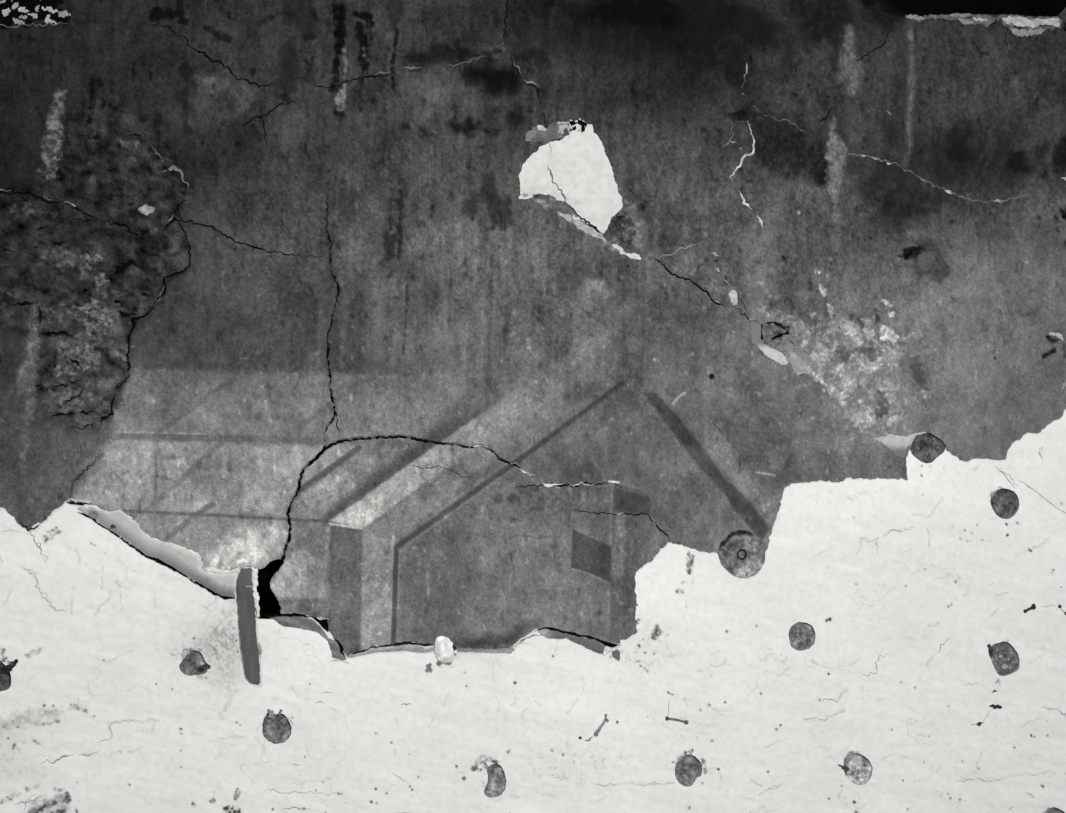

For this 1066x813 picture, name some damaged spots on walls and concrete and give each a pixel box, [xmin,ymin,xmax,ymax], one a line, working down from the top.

peeling [0,0,71,29]
damp [38,90,67,179]
crack [142,23,421,147]
crack [448,0,601,233]
peeling [525,118,586,141]
crack [654,243,794,345]
damp [17,307,42,469]
crack [0,189,670,559]
peeling [66,498,240,599]
spalling [262,613,621,672]
spalling [1,788,78,813]